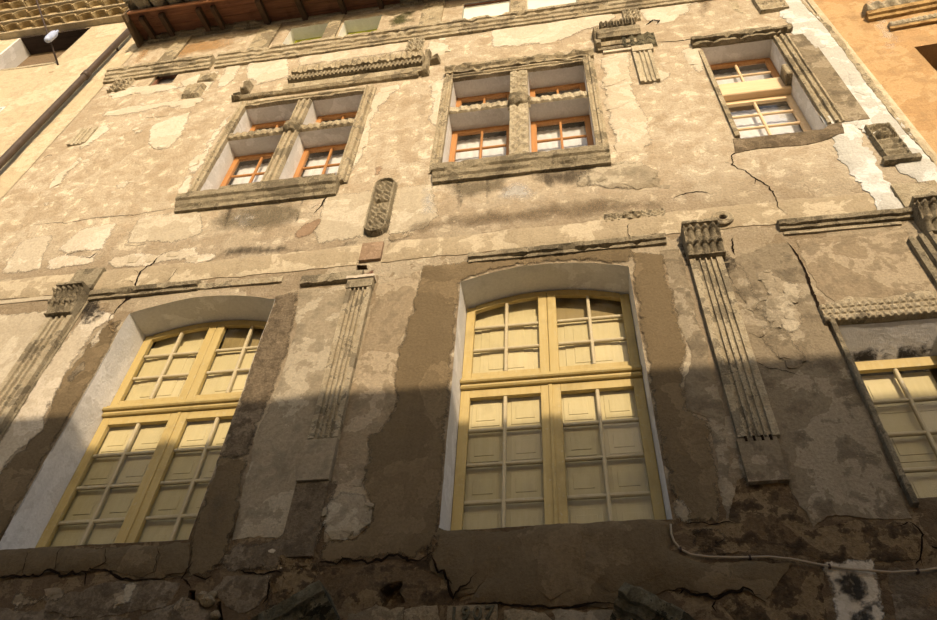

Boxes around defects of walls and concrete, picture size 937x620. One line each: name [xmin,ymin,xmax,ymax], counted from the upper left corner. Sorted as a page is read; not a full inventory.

flaking render [491,14,616,47]
flaking render [639,2,698,24]
flaking render [49,42,407,194]
crack [727,153,786,213]
crack [108,244,177,323]
spalling [108,247,216,268]
flaking render [724,254,806,369]
crack [787,242,832,333]
flaking render [322,477,374,541]
crack [0,547,213,588]
crack [317,549,614,609]
crack [899,522,937,568]